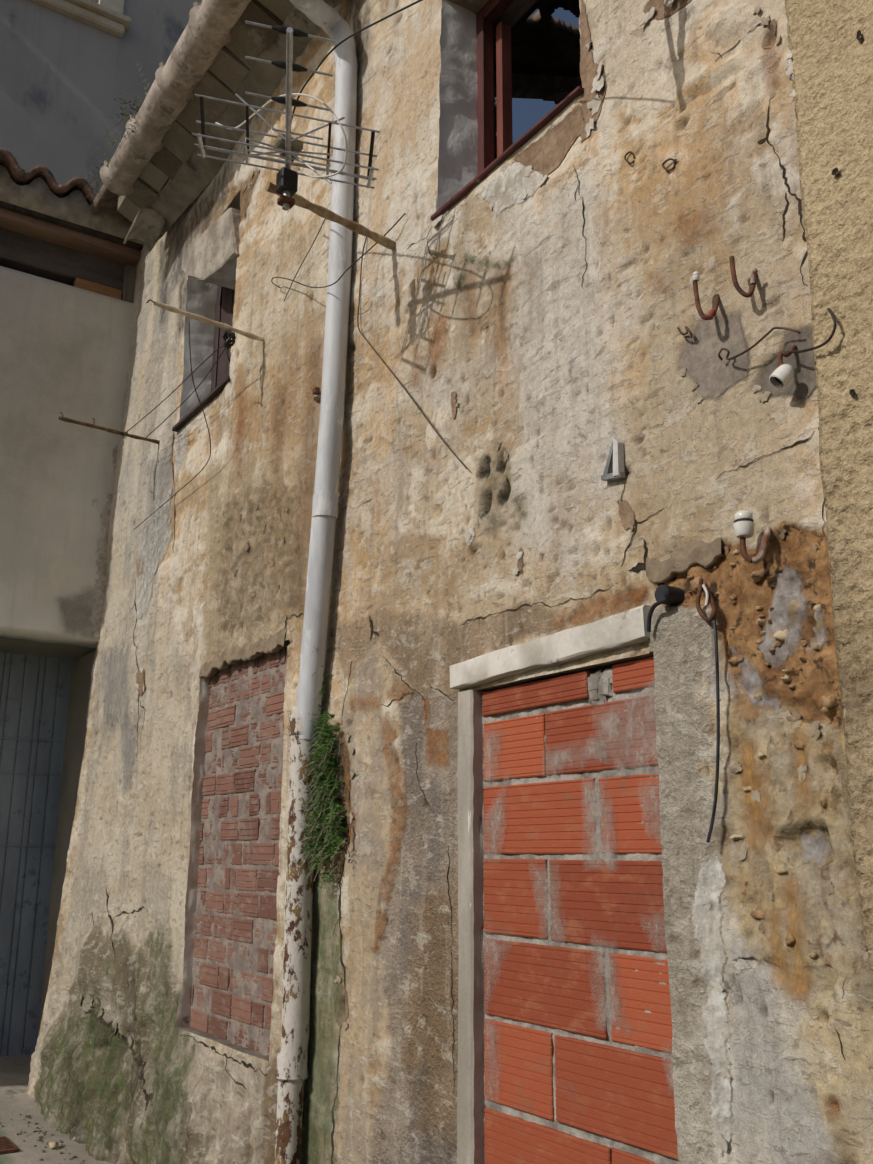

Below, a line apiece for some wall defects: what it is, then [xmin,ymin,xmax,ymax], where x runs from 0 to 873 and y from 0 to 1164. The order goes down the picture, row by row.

peeling [639,0,691,27]
peeling [481,0,606,215]
crack [758,97,808,285]
crack [716,428,819,480]
crack [461,483,663,625]
spalling [646,521,861,1156]
crack [92,888,144,957]
crack [84,1009,154,1131]